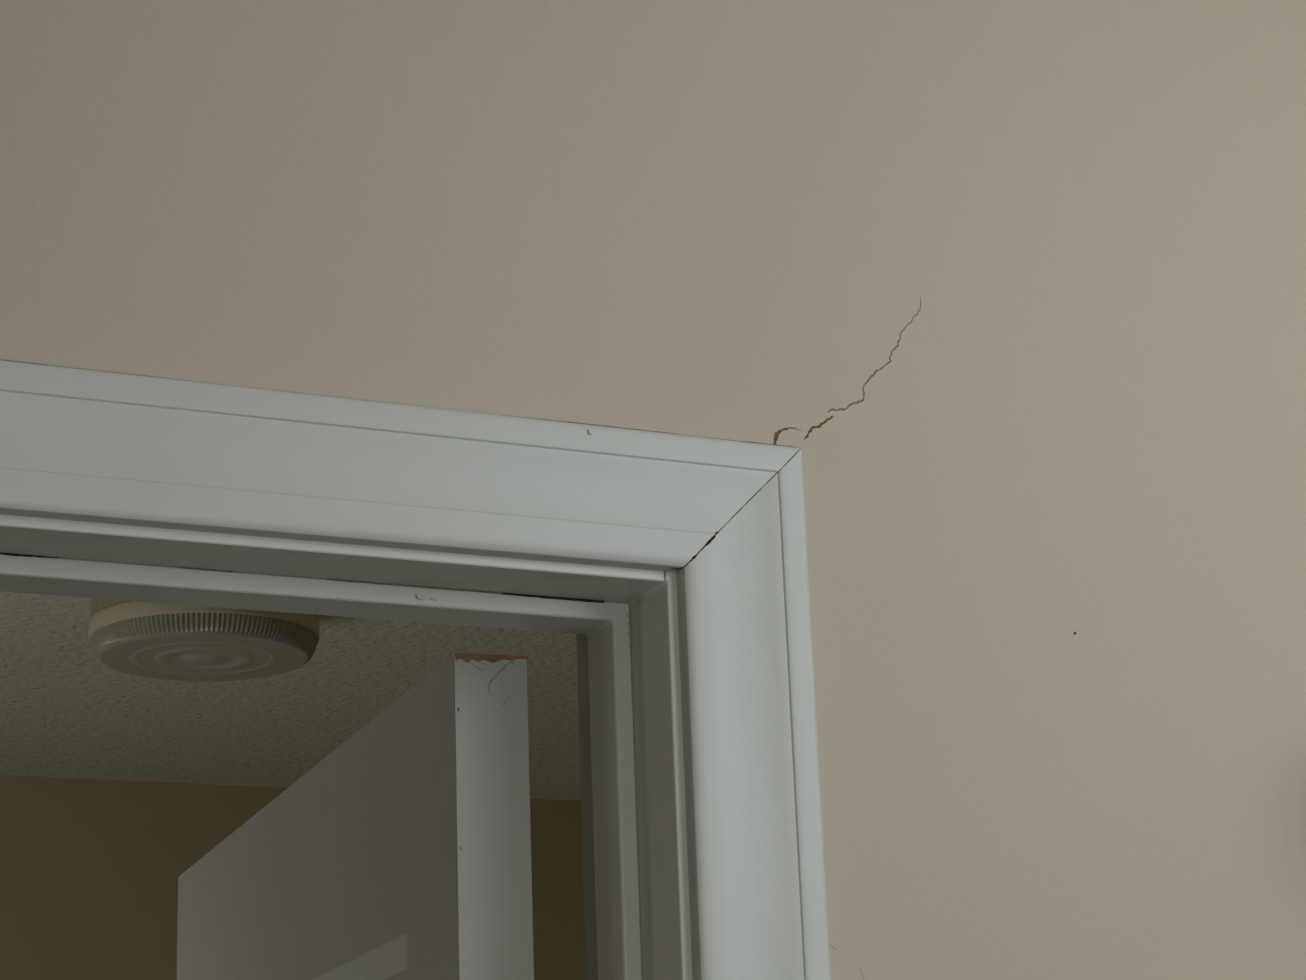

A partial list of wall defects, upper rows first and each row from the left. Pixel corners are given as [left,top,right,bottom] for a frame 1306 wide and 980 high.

crack [486,297,921,581]